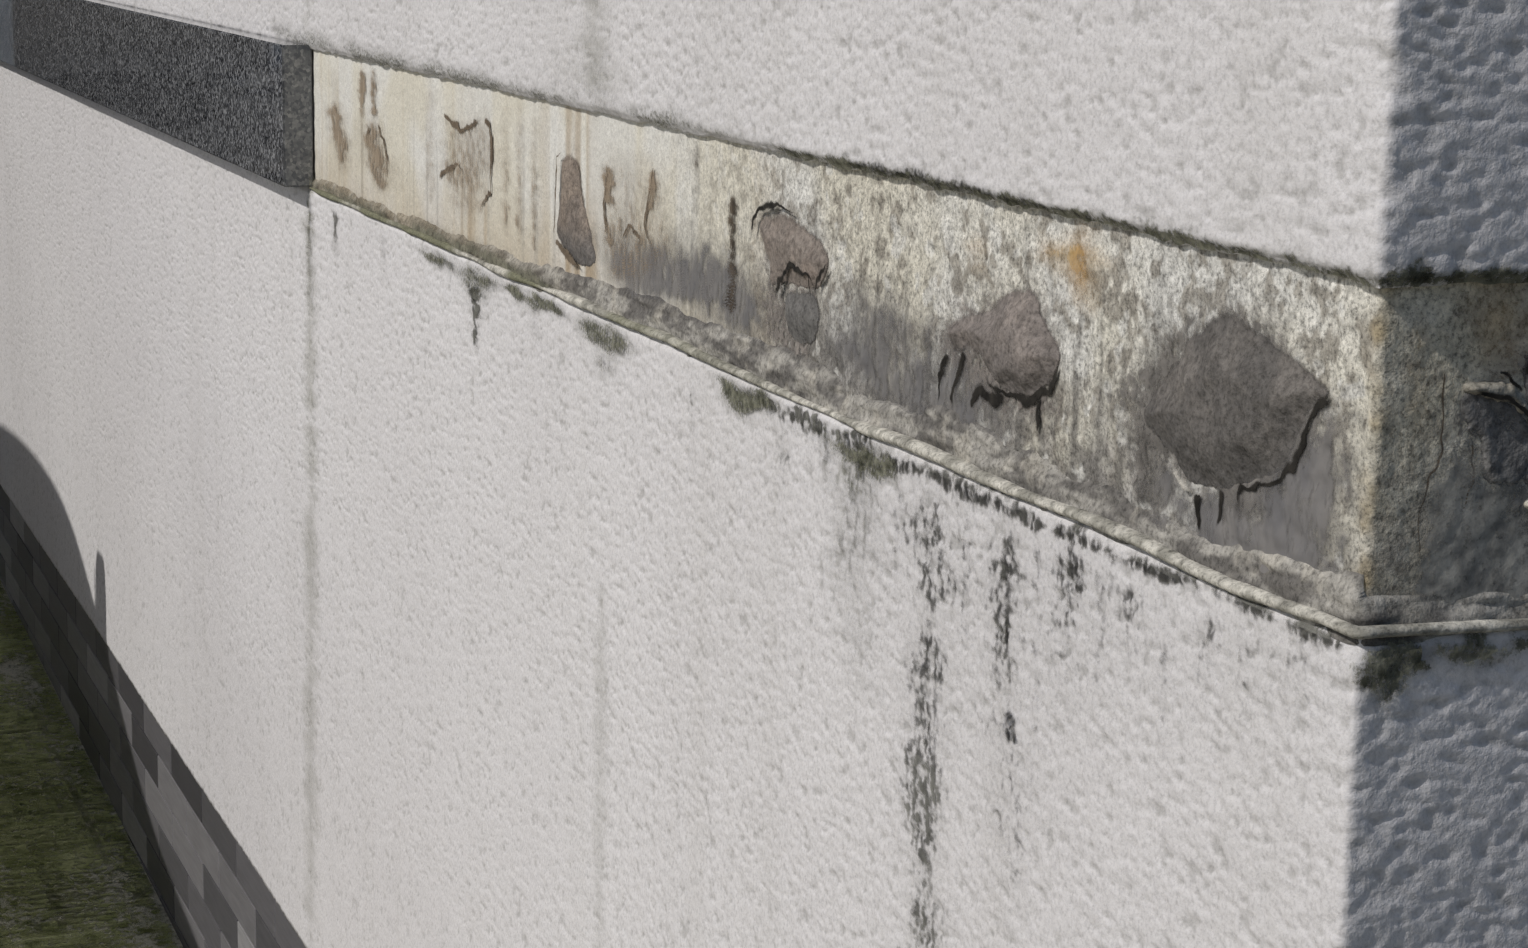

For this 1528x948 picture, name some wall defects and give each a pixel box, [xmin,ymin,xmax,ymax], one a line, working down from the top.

water stain [327,71,389,190]
water stain [468,285,480,347]
water stain [610,196,761,333]
water stain [836,298,998,436]
peeling [1460,355,1528,509]
water stain [1413,457,1528,607]
water stain [763,396,1349,948]